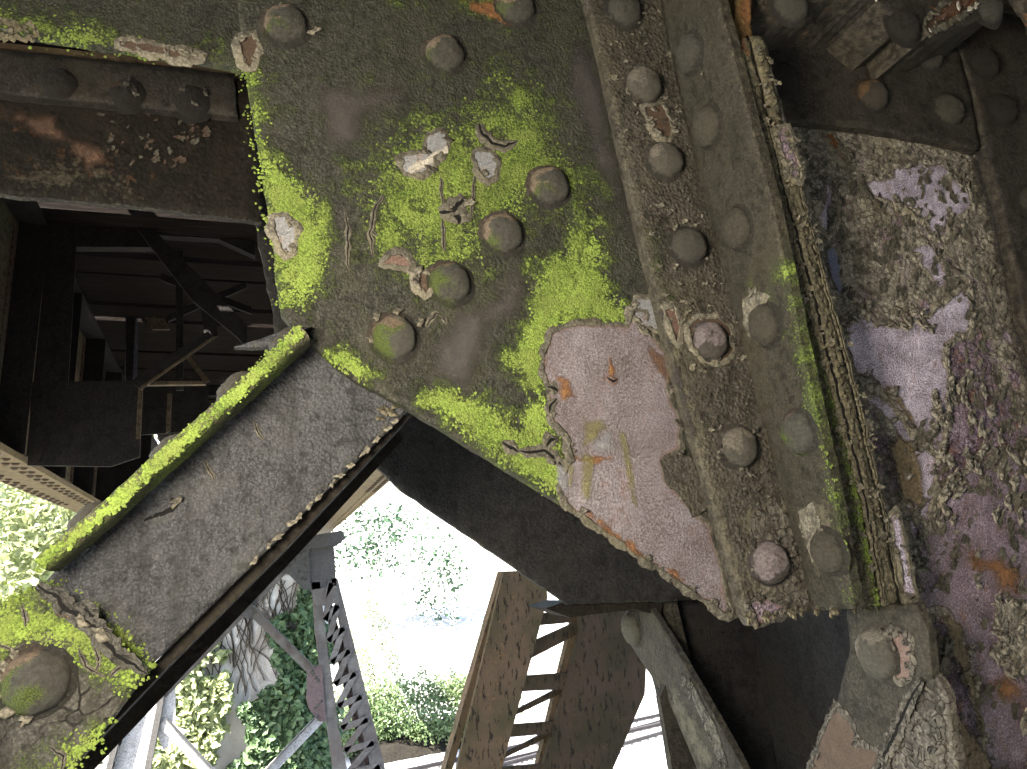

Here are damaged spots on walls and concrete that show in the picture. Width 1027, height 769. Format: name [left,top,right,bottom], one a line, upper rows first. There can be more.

peeling [0,17,40,43]
peeling [610,53,682,155]
peeling [394,127,455,181]
peeling [471,145,502,187]
peeling [538,168,884,630]
peeling [754,46,1027,769]
crack [0,581,148,677]
crack [49,746,68,769]
peeling [680,672,727,769]